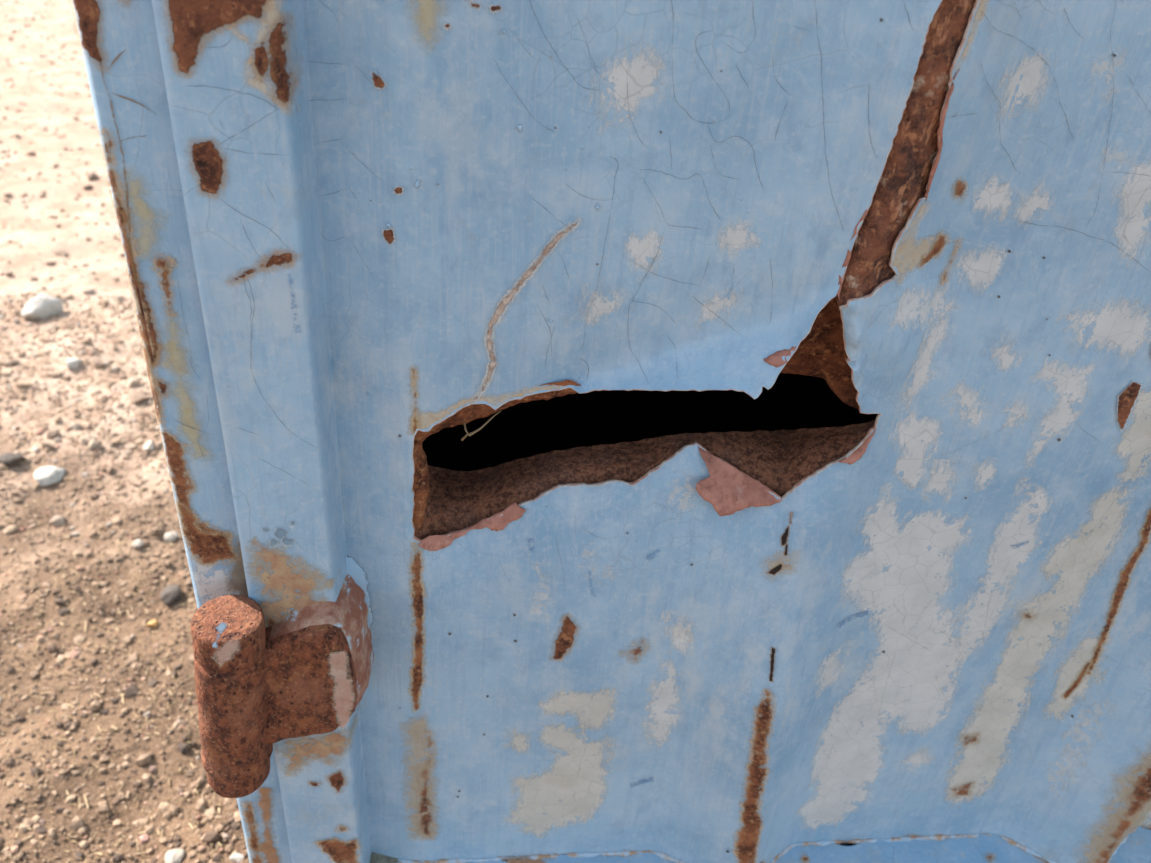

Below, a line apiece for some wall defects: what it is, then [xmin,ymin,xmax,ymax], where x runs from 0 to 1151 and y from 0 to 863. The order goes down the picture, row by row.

corrosion [168,0,297,107]
peeling [602,53,662,121]
corrosion [780,0,987,409]
peeling [925,68,960,201]
peeling [973,178,1049,222]
peeling [1116,162,1151,258]
corrosion [100,128,334,627]
corrosion [407,369,876,863]
peeling [797,288,1151,829]
corrosion [1063,511,1151,698]
peeling [509,689,615,837]
corrosion [1085,754,1151,863]